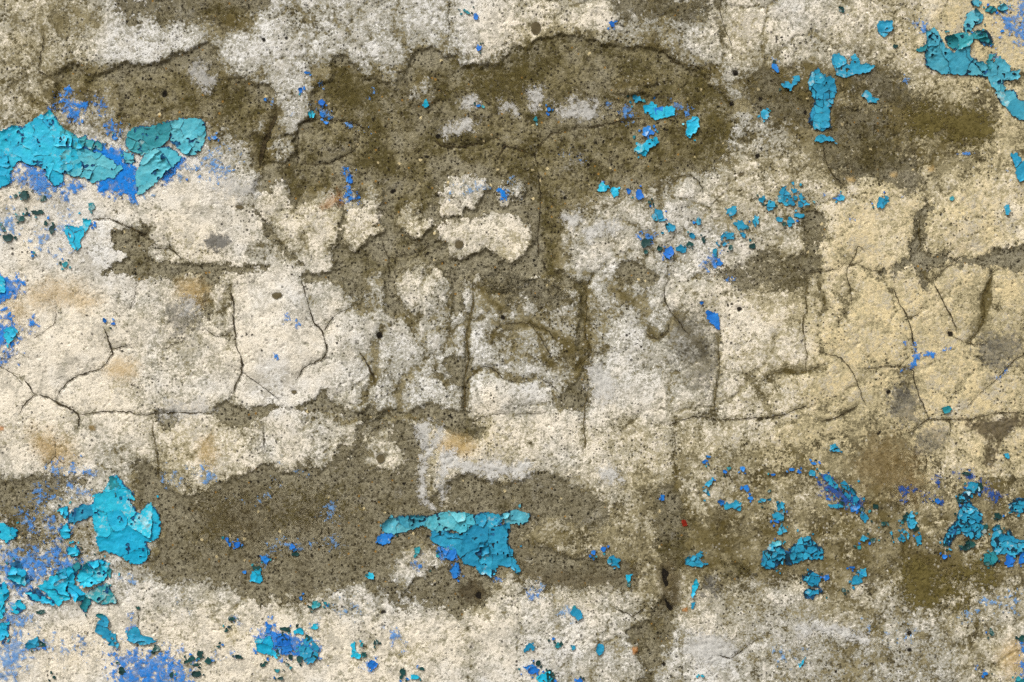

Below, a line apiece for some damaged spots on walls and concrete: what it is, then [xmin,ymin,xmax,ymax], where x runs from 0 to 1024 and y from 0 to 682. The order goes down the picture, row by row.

water stain [443,94,481,138]
water stain [499,85,598,120]
water stain [204,231,232,253]
spalling [0,0,1024,413]
crack [0,292,279,473]
crack [297,279,355,379]
crack [667,246,1024,478]
spalling [0,341,640,682]
water stain [414,422,535,510]
spalling [649,455,829,609]
peeling [767,459,1024,569]
water stain [958,411,1024,469]